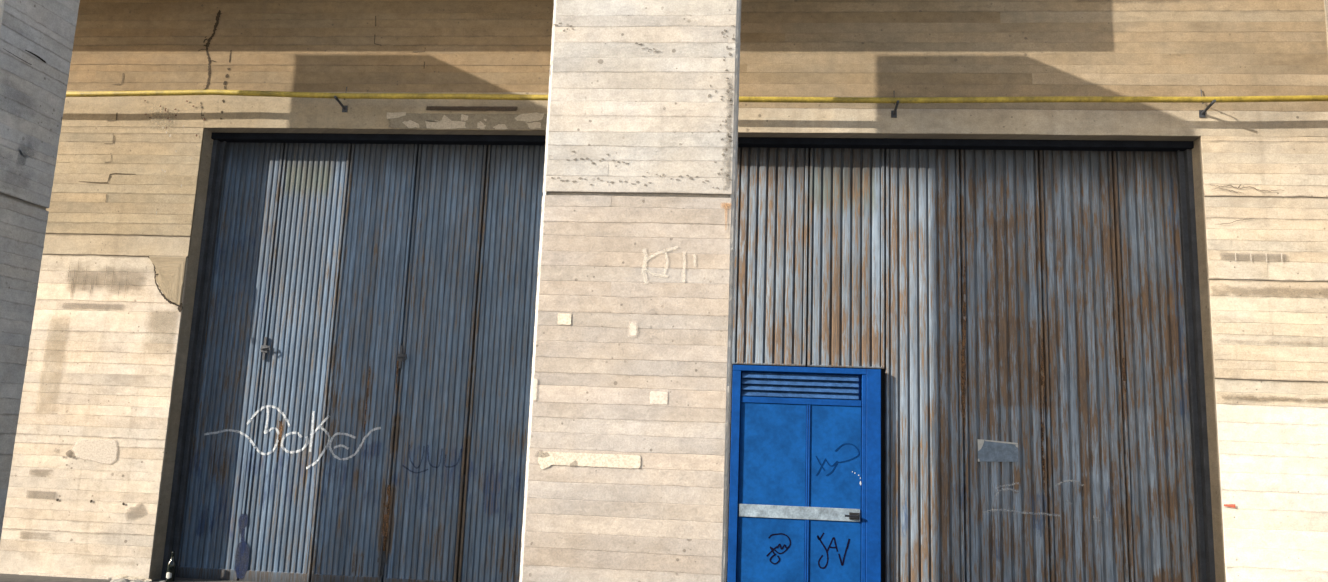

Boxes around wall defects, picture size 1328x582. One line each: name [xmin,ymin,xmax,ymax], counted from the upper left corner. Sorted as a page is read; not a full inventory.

crack [198,10,231,121]
peeling [387,112,547,130]